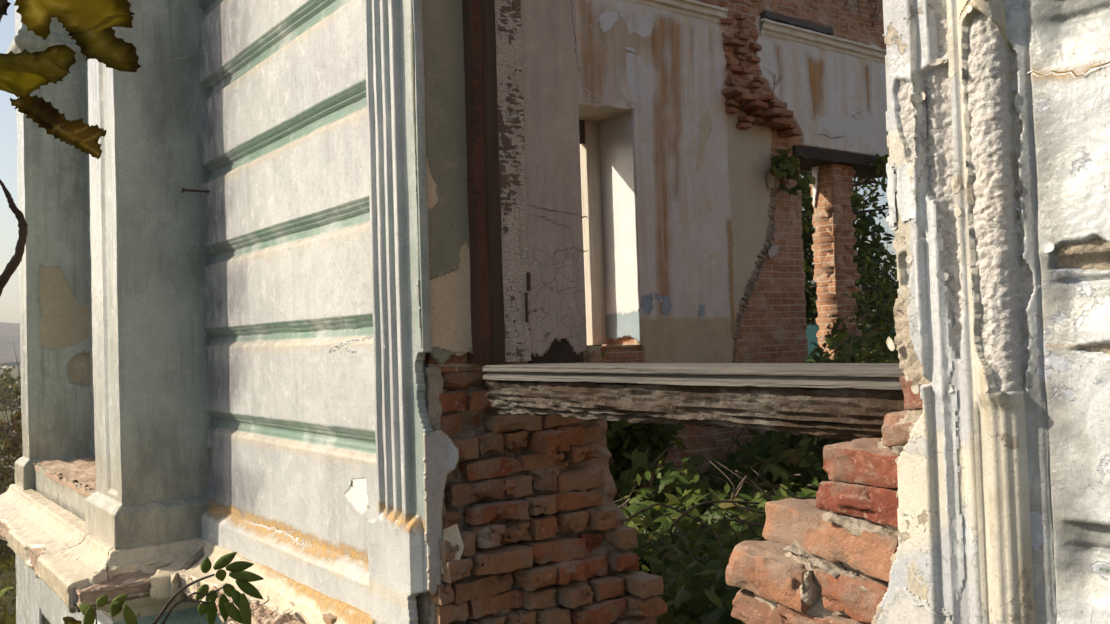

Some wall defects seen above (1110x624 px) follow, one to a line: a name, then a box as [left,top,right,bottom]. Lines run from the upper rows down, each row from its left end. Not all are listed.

crack [1027,60,1110,80]
rust [654,19,679,306]
spalling [39,264,89,388]
peeling [417,241,472,356]
crack [529,205,588,333]
spalling [885,0,1034,600]
spalling [1044,236,1110,271]
peeling [345,479,369,513]
spalling [27,546,46,579]
spalling [68,542,337,624]
peeling [441,524,464,574]
peeling [877,587,953,624]